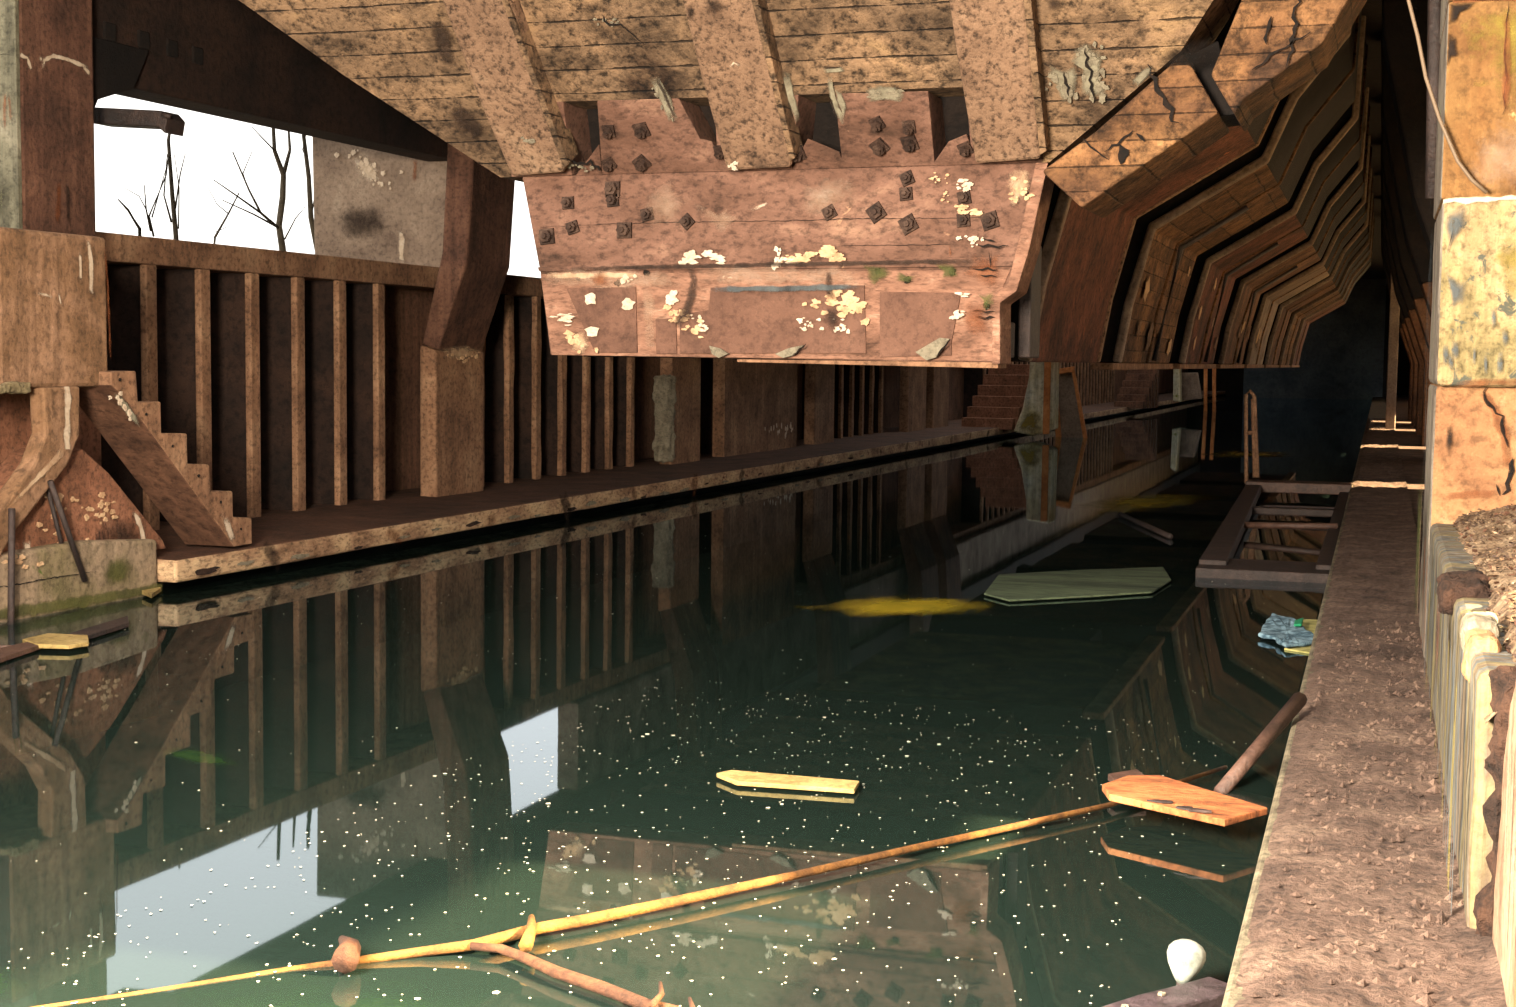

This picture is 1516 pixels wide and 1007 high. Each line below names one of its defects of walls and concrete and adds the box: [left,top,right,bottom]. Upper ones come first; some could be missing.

crack [1252,0,1310,70]
peeling [929,172,983,216]
peeling [1008,172,1035,203]
peeling [678,250,726,265]
peeling [771,245,846,271]
peeling [956,235,984,247]
peeling [550,272,637,354]
peeling [663,290,729,358]
peeling [776,289,870,358]
crack [1483,388,1514,496]